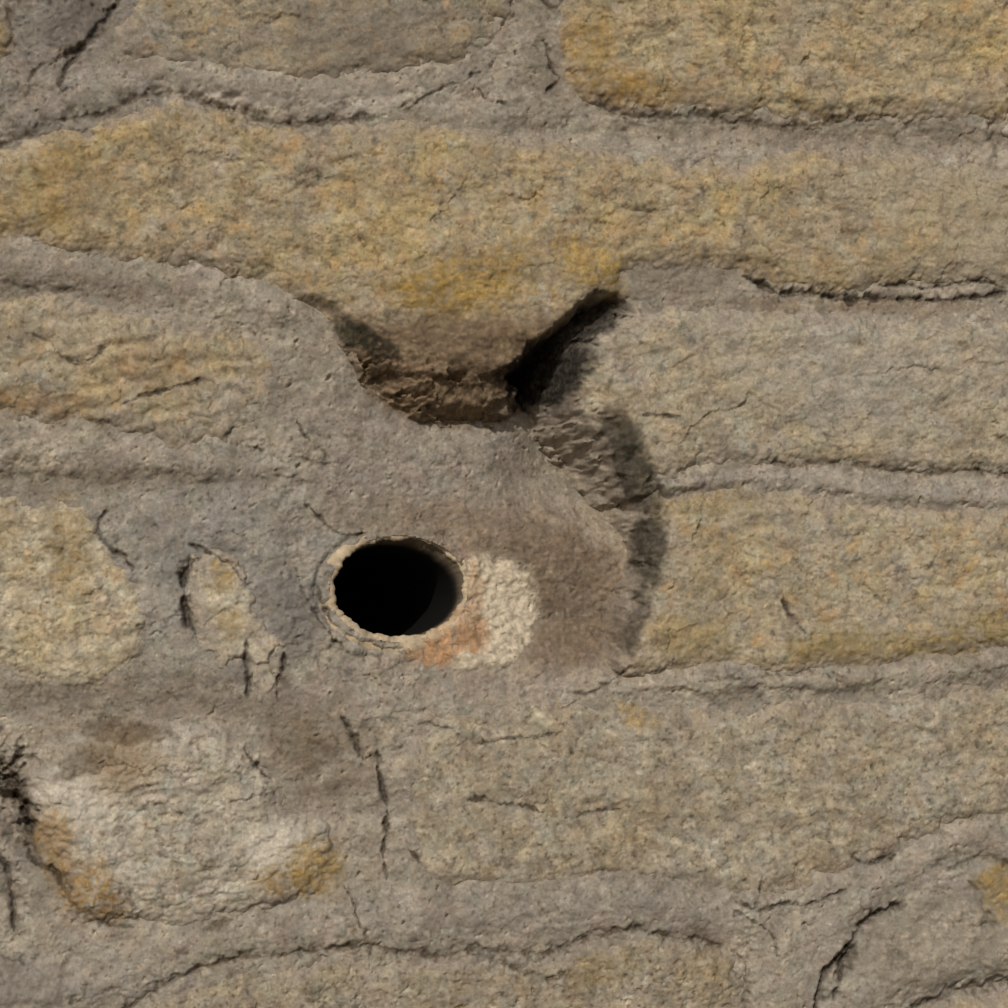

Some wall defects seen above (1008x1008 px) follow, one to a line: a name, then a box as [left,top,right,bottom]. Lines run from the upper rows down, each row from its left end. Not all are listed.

damp [495,305,617,411]
damp [629,504,666,587]
crack [0,746,133,932]
crack [340,715,388,879]
crack [814,903,905,1007]